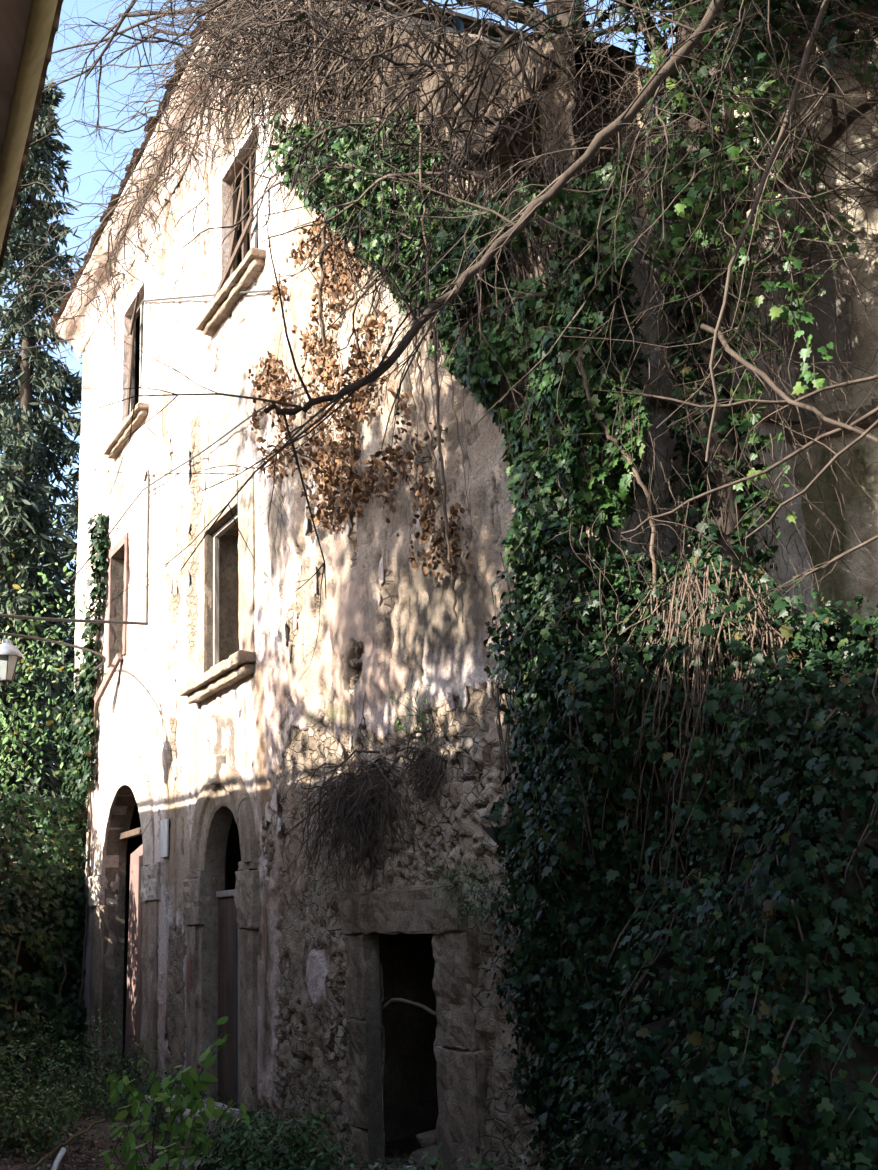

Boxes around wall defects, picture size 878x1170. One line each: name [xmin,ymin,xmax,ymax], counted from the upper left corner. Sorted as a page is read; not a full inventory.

flaking render [349,641,369,703]
flaking render [261,680,559,1170]